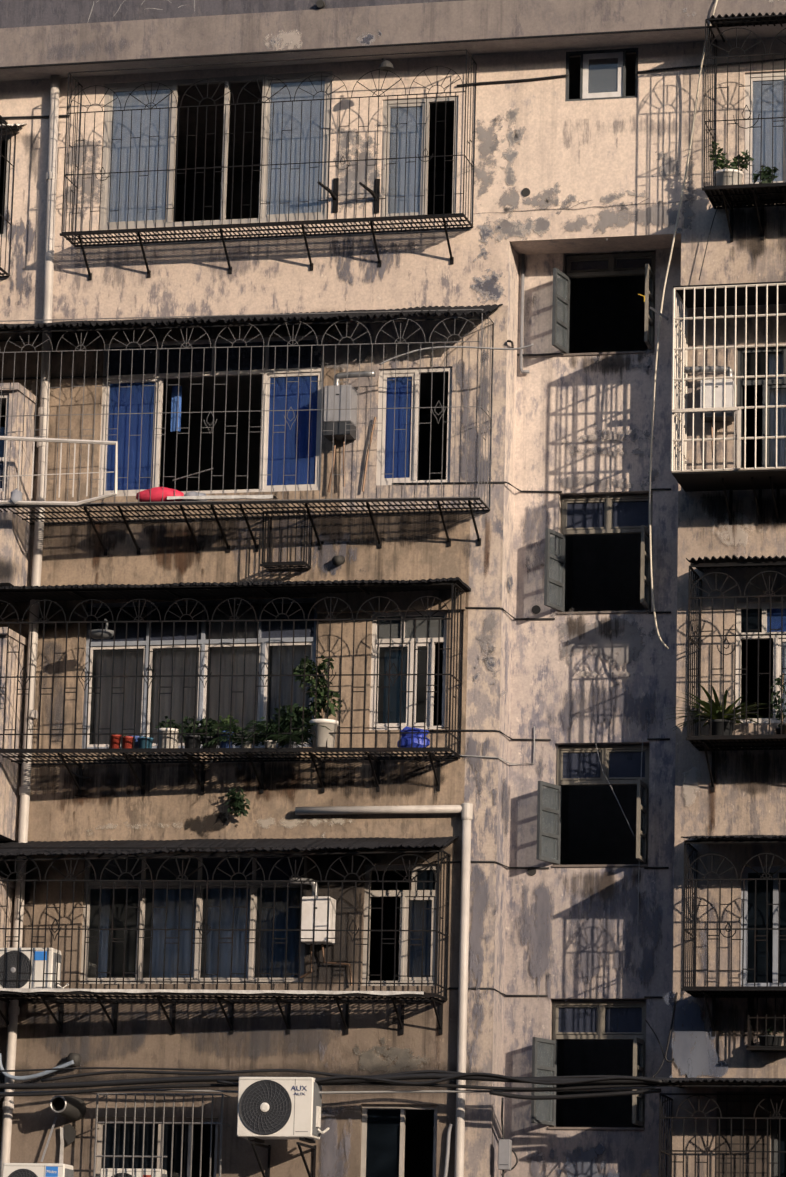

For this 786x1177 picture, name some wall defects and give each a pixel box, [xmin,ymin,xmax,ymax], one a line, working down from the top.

damp [329,237,415,285]
damp [549,672,656,738]
damp [162,812,237,837]
damp [257,817,352,838]
damp [517,883,554,1000]
damp [571,885,662,994]
damp [664,991,728,1078]